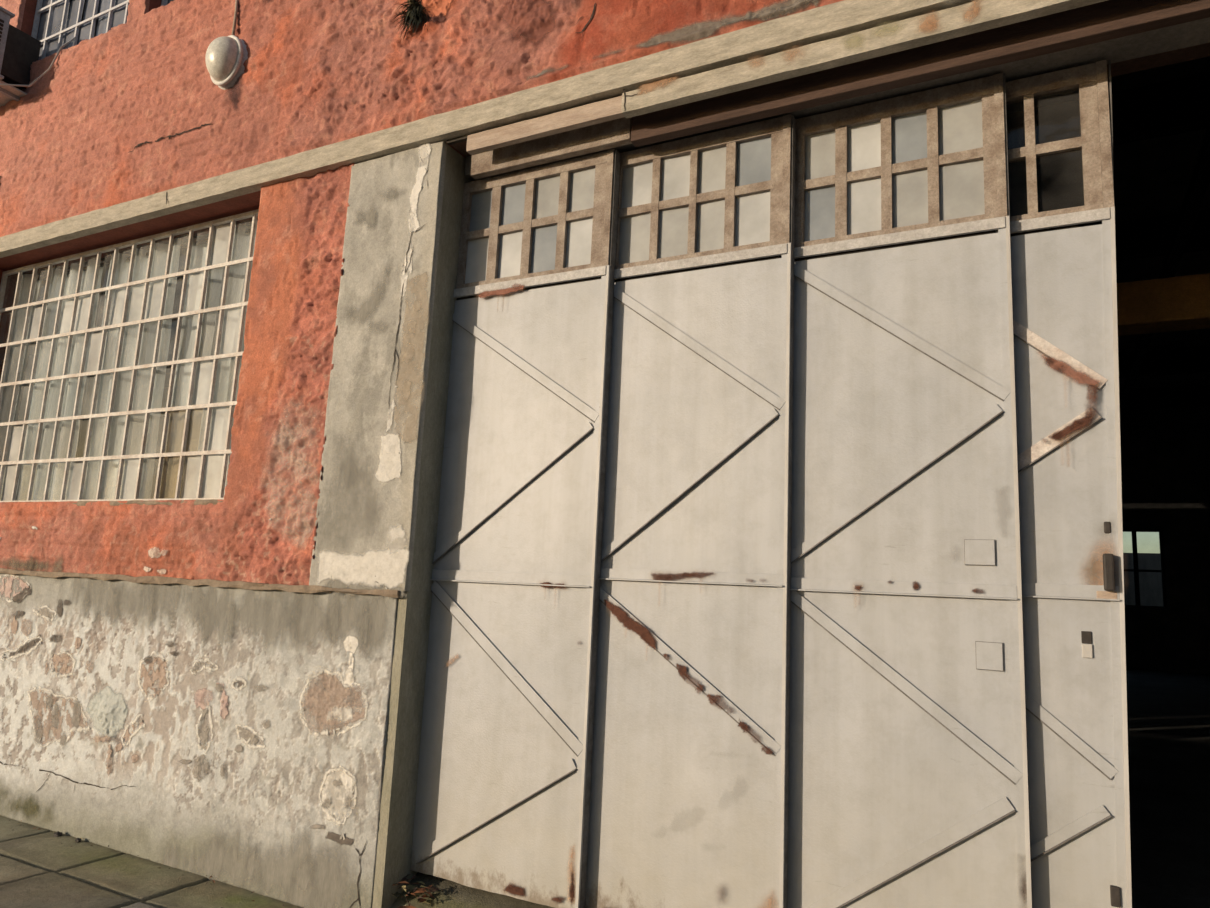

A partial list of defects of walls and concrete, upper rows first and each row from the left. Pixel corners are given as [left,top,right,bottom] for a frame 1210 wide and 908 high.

peeling [408,143,432,232]
crack [389,157,428,408]
corrosion [479,285,524,298]
flaking render [375,248,428,482]
corrosion [1043,356,1098,442]
peeling [318,524,409,589]
corrosion [652,572,713,581]
peeling [0,574,93,747]
corrosion [604,599,773,755]
crack [0,762,135,792]
peeling [310,766,357,845]
crack [350,841,367,908]